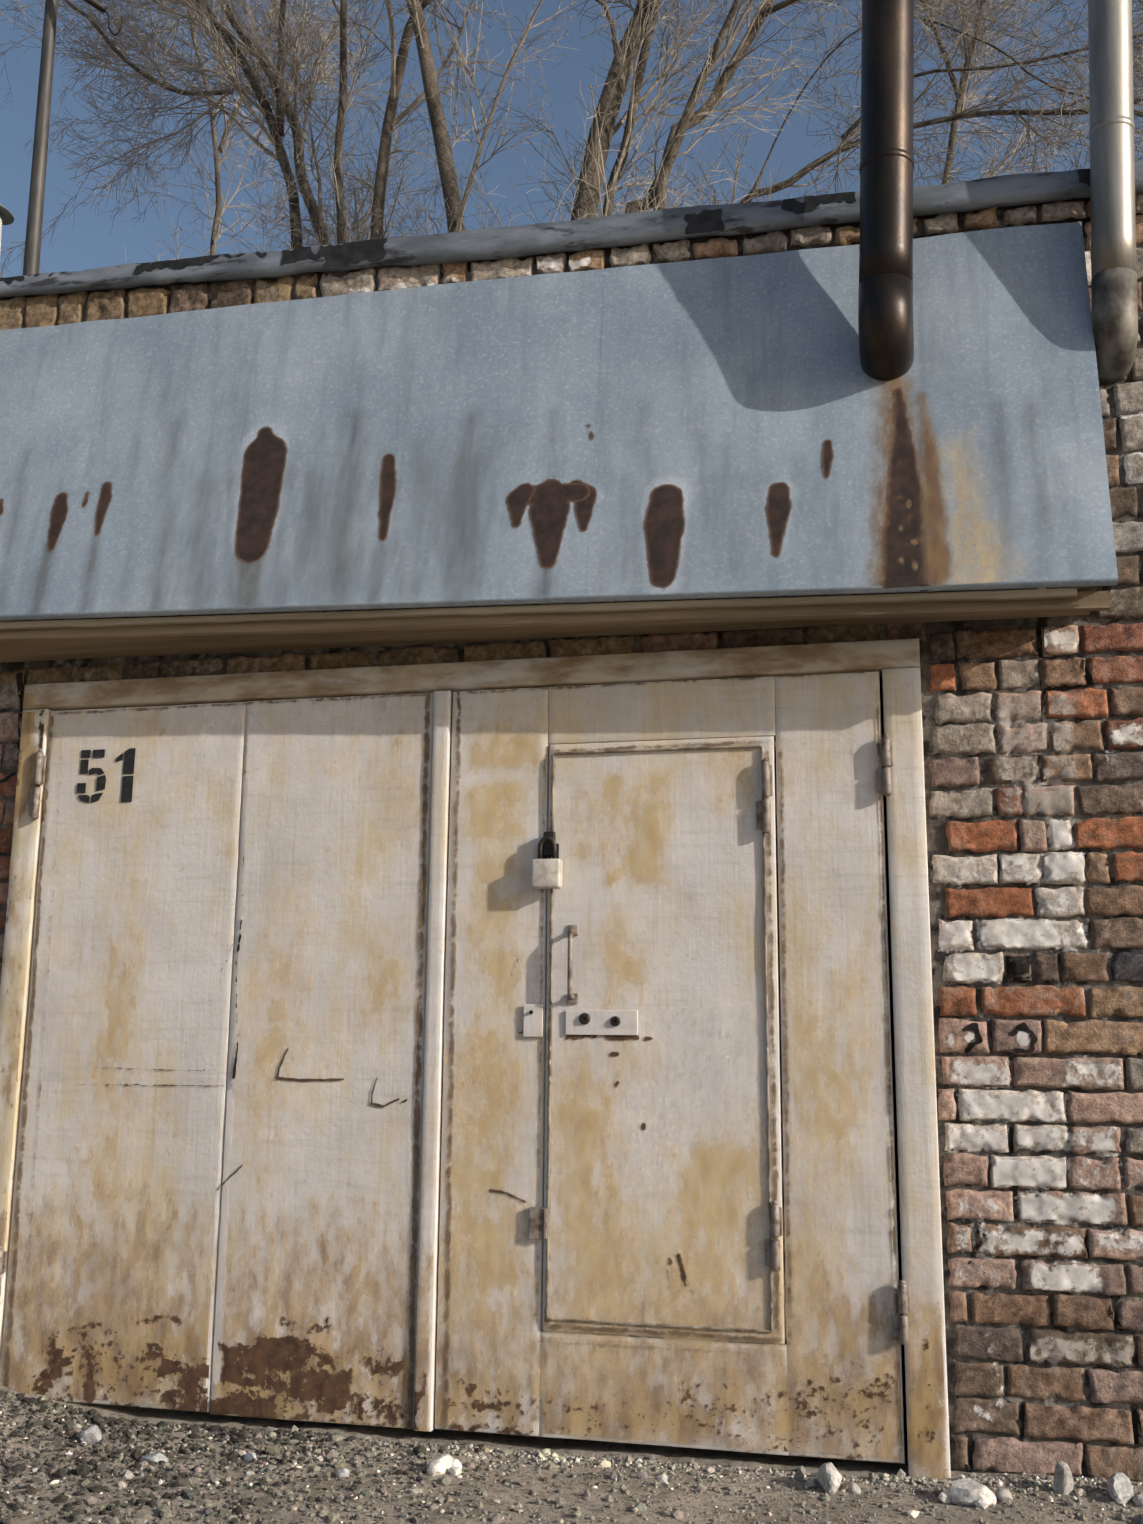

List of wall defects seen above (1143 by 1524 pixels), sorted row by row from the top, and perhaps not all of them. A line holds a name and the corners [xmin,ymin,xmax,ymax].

corrosion [32,481,112,614]
corrosion [235,426,287,607]
corrosion [378,454,397,541]
corrosion [506,479,597,595]
corrosion [644,484,685,588]
corrosion [765,482,792,557]
corrosion [822,440,834,478]
corrosion [872,377,999,592]
corrosion [0,689,948,1479]